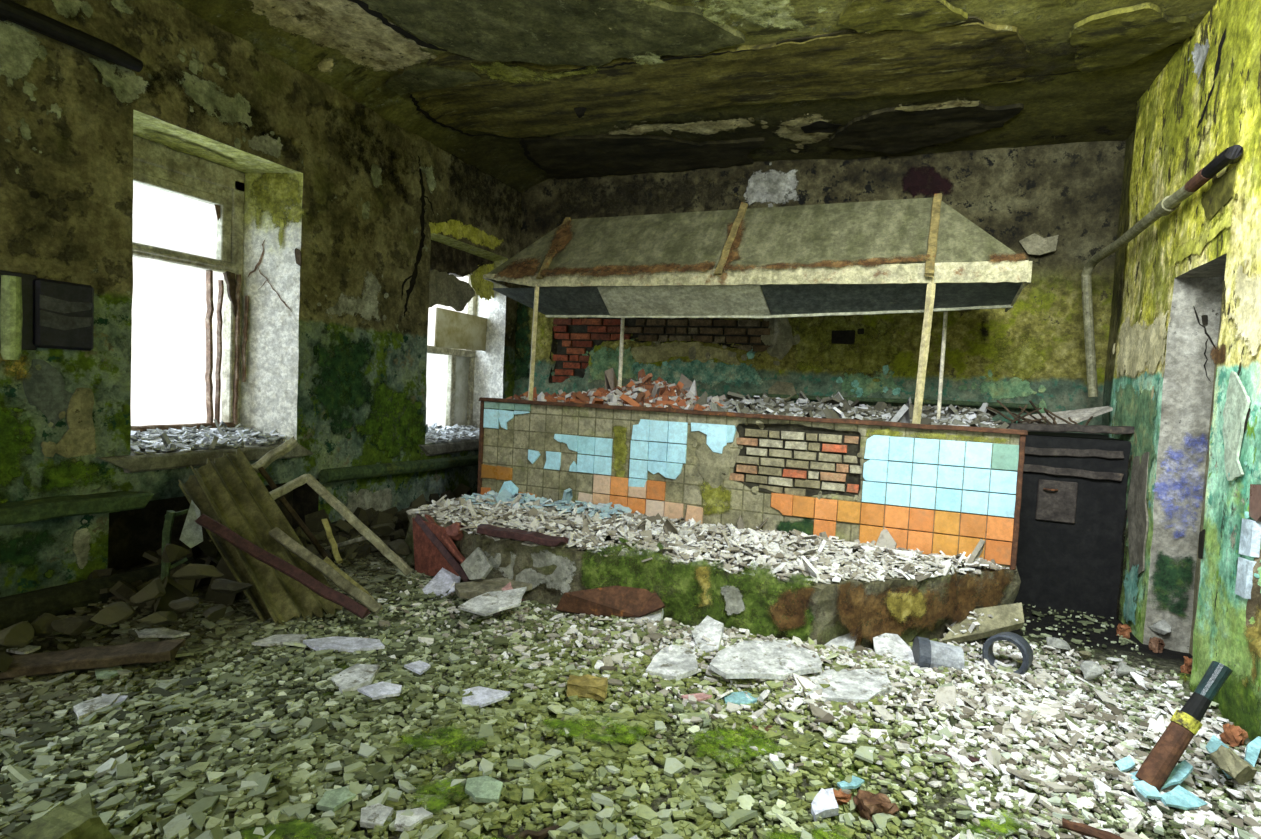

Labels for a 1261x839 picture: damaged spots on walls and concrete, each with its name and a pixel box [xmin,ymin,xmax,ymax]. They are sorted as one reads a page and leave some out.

peeling [0,20,63,119]
peeling [52,0,133,18]
peeling [82,52,152,106]
peeling [143,54,283,164]
crack [348,0,447,52]
peeling [249,0,1030,207]
crack [401,156,435,317]
peeling [1173,166,1238,266]
spalling [692,420,862,500]
flaking render [1210,258,1261,628]